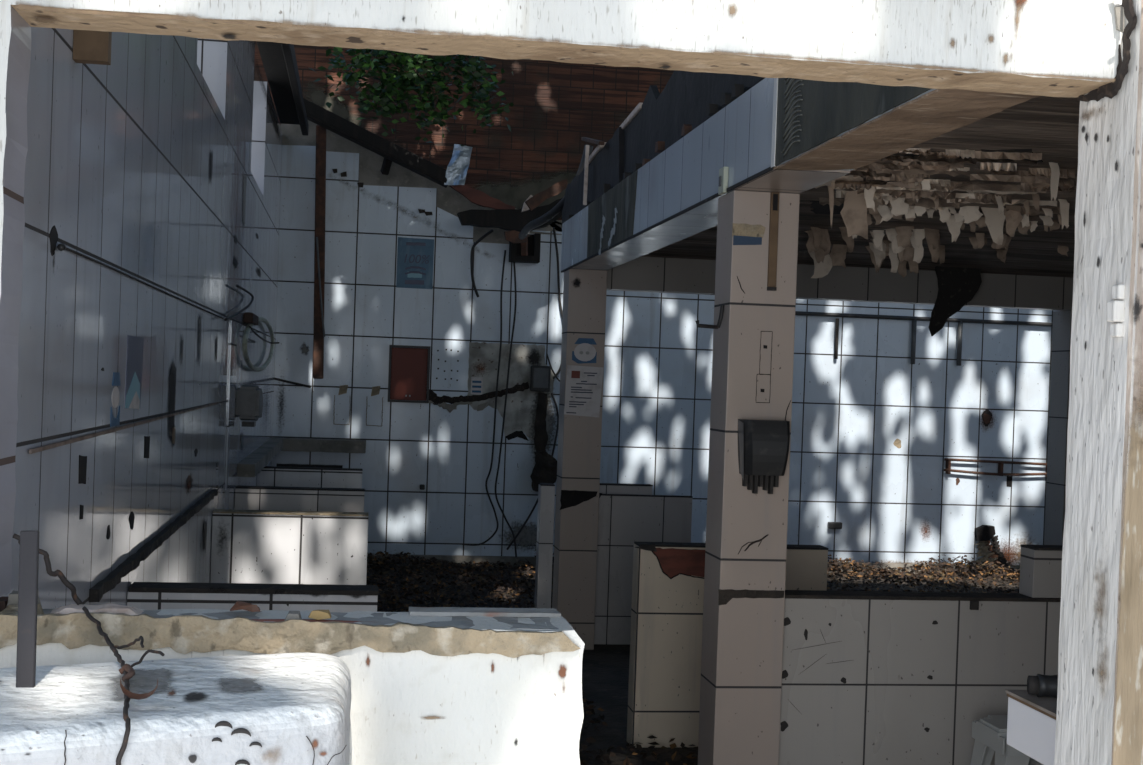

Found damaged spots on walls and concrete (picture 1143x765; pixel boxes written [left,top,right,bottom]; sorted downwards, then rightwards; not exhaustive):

corrosion [1015,0,1027,30]
crack [1078,0,1137,102]
peeling [804,148,1076,278]
spalling [467,342,602,510]
spalling [635,544,705,579]
spalling [0,614,18,649]
spalling [36,611,580,658]
spalling [111,669,173,700]
spalling [219,678,262,692]